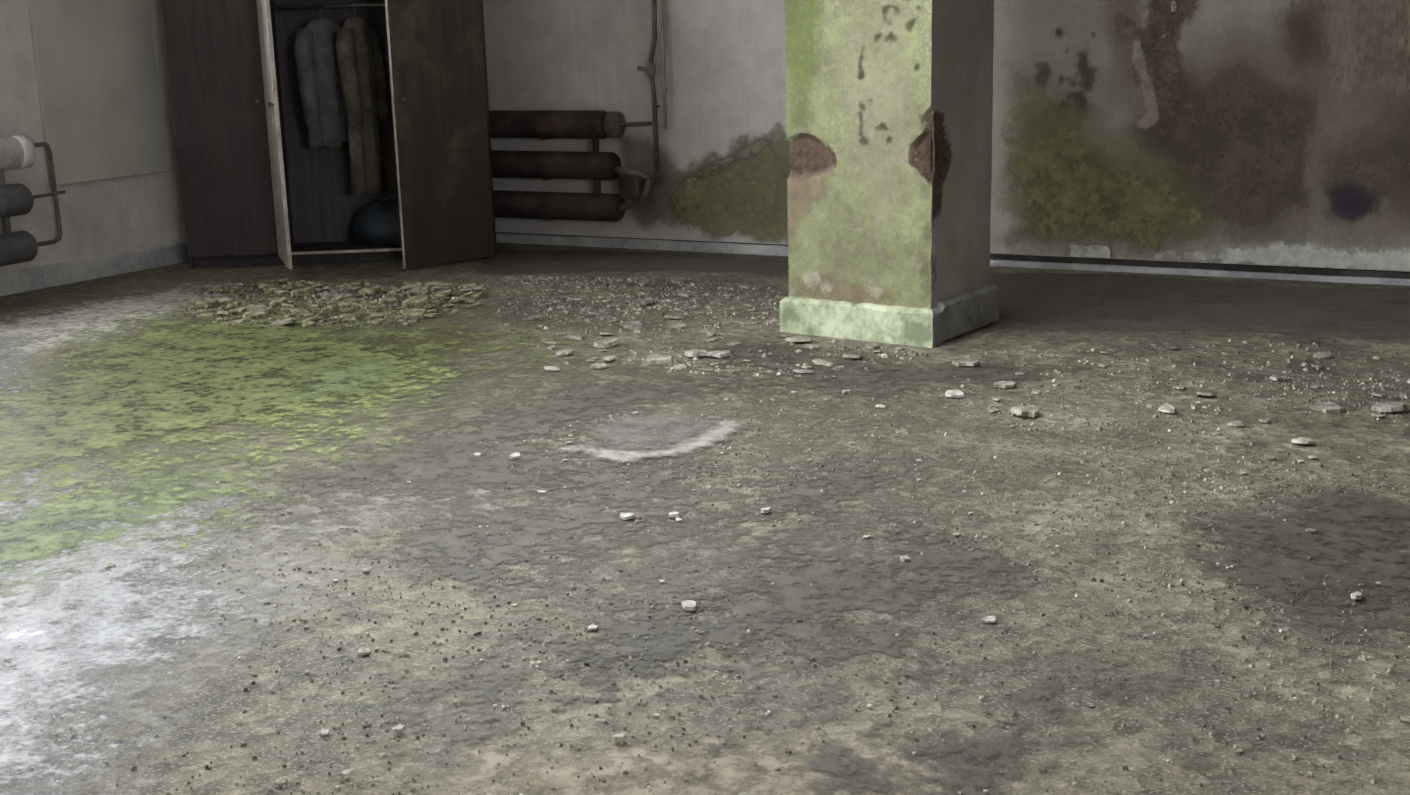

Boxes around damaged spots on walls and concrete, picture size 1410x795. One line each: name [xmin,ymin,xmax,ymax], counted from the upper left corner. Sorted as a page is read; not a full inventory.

spalling [787,133,837,234]
water stain [859,104,891,145]
water stain [858,6,919,79]
spalling [909,112,951,225]
water stain [1035,28,1097,127]
water stain [989,244,1410,337]